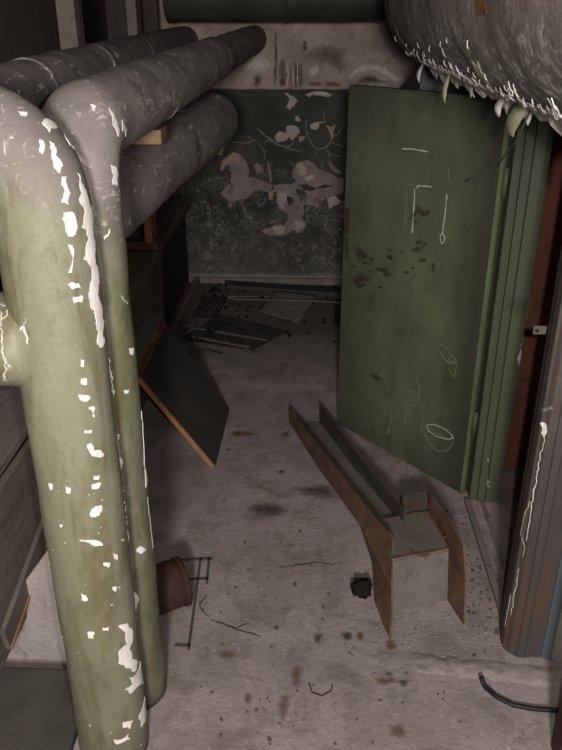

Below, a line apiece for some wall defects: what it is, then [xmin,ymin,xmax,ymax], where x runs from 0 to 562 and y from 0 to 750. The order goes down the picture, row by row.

crack [231,110,344,161]
peeling [275,93,305,142]
peeling [306,91,332,99]
peeling [310,121,336,140]
peeling [216,145,344,236]